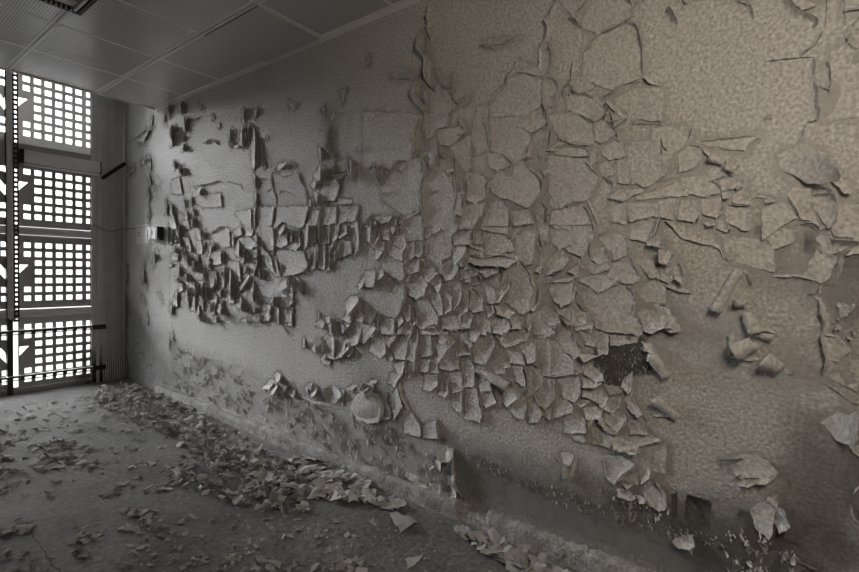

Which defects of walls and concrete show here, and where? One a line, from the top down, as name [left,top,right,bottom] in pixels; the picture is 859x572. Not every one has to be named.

peeling [133,0,859,532]
peeling [405,554,423,570]
peeling [455,526,564,572]
peeling [666,452,818,572]